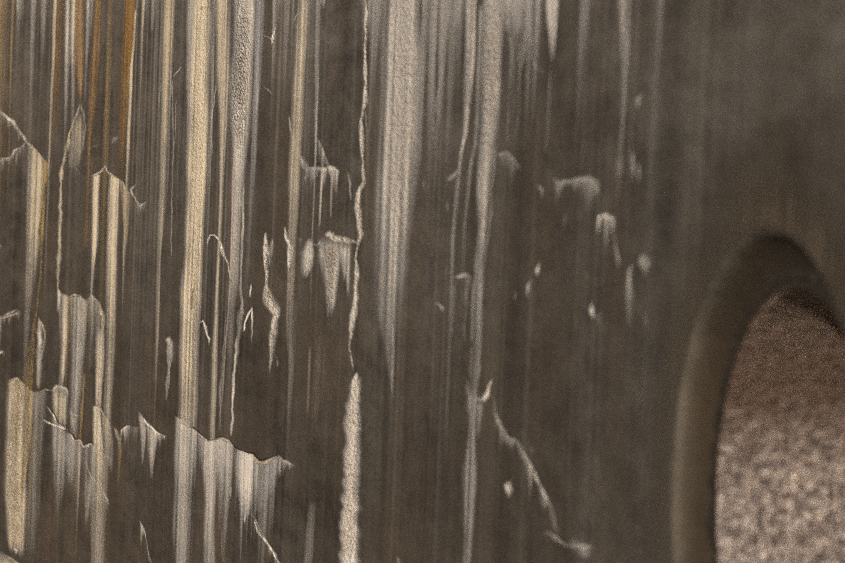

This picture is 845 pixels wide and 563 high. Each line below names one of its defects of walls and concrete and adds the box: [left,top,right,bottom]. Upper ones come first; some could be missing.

rust [25,0,62,390]
water stain [0,165,130,563]
rust [75,0,111,196]
rust [122,0,136,183]
water stain [177,0,281,552]
crack [254,521,279,563]
water stain [284,0,338,271]
water stain [302,231,358,309]
water stain [342,373,359,563]
crack [348,0,368,368]
water stain [381,0,557,321]
crack [528,460,549,502]